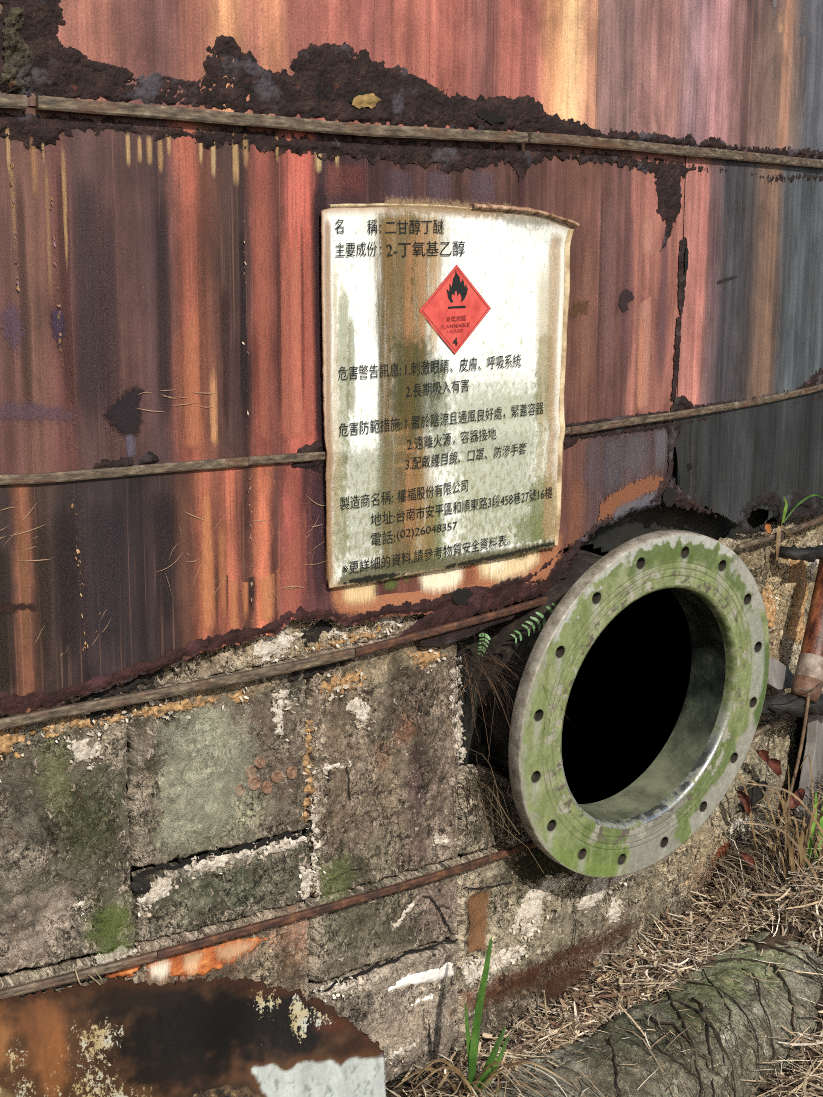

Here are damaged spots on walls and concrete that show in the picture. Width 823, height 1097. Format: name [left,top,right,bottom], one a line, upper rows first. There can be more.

corrosion [0,0,823,715]
corrosion [104,937,268,978]
corrosion [468,919,643,1011]